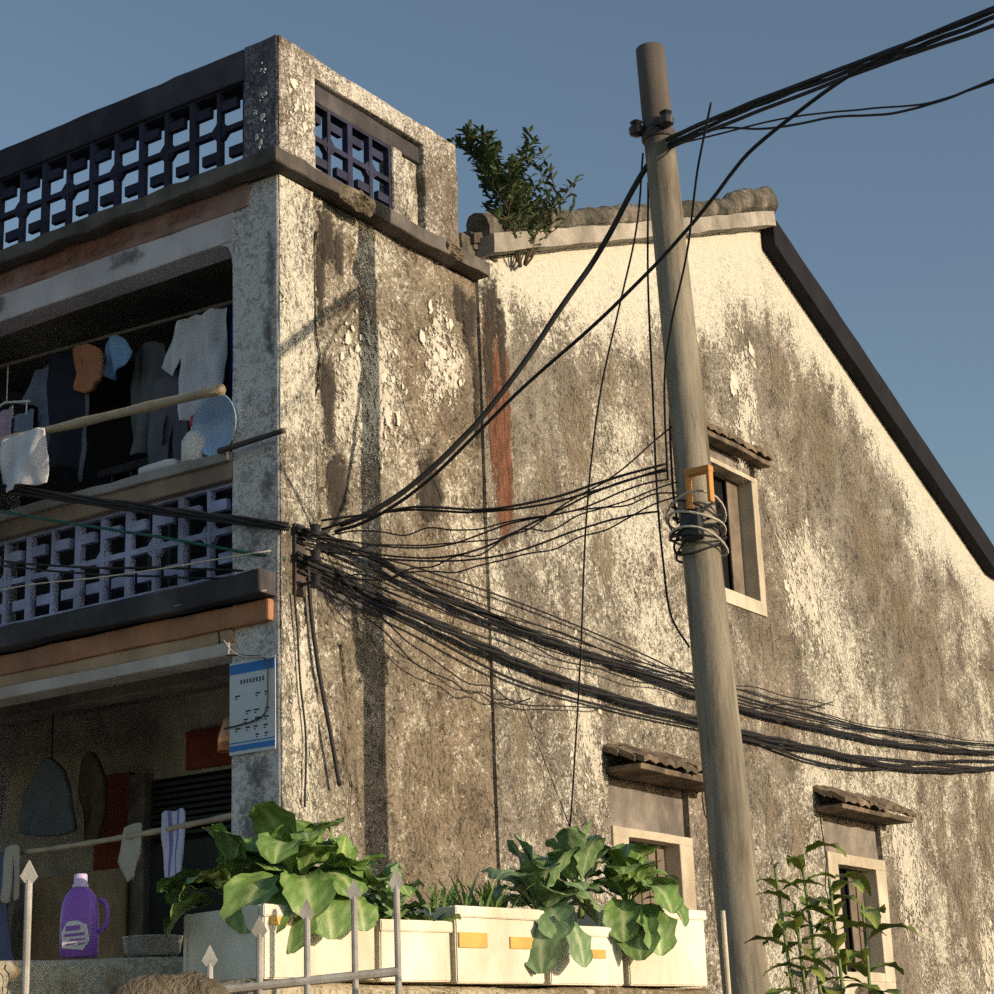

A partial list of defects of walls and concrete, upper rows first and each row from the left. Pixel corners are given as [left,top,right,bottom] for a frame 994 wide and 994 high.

damp [316,201,345,335]
damp [318,350,349,528]
peeling [334,387,400,469]
peeling [334,309,408,396]
damp [387,449,445,573]
peeling [419,300,462,405]
damp [453,274,506,450]
corrosion [482,306,514,548]
damp [532,357,590,532]
damp [450,819,484,904]
damp [761,776,824,983]
damp [930,794,947,858]